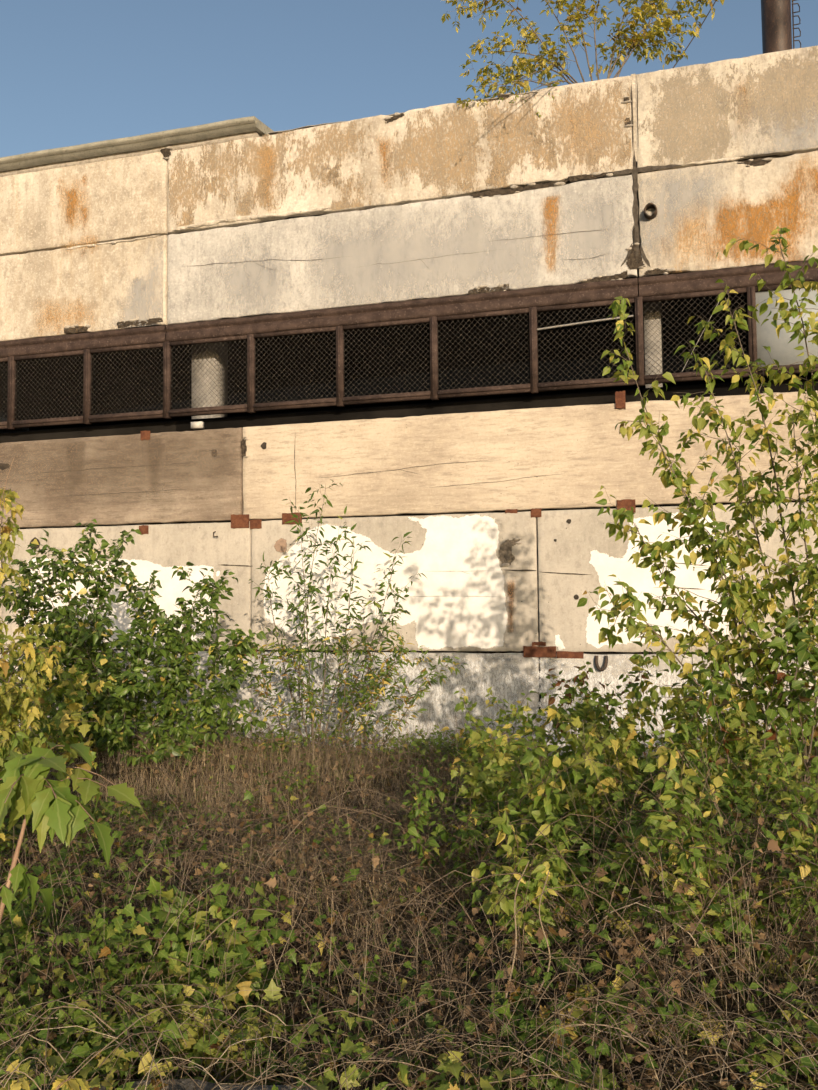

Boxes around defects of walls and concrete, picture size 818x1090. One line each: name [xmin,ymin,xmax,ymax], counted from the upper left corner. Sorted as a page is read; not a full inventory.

rust [66,177,86,226]
rust [545,199,557,269]
rust [677,162,818,262]
spalling [499,537,522,567]